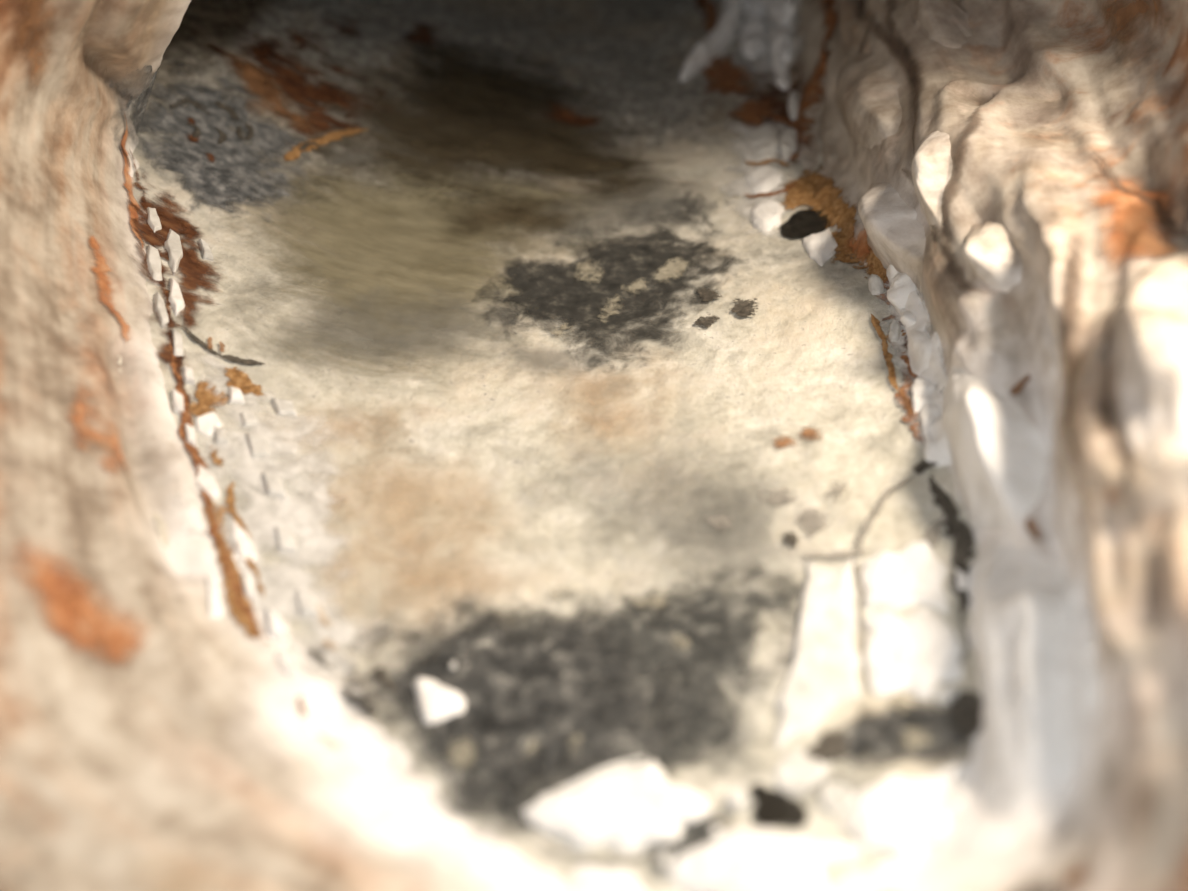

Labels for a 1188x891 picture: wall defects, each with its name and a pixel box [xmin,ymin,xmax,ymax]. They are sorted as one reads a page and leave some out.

corrosion [207,30,386,161]
corrosion [90,236,129,340]
corrosion [121,114,144,248]
leakage [125,50,736,367]
peeling [802,227,838,266]
leakage [158,271,299,678]
crack [802,459,976,694]
leakage [351,566,804,829]
leakage [806,690,984,779]